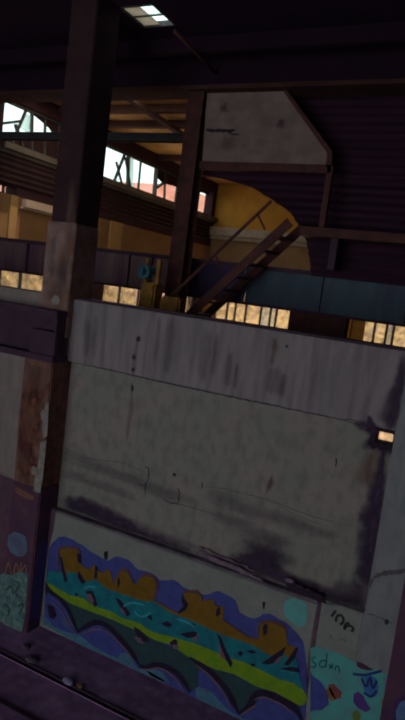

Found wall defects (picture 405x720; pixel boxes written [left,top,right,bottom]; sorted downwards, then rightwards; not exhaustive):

flaking render [18,370,49,493]